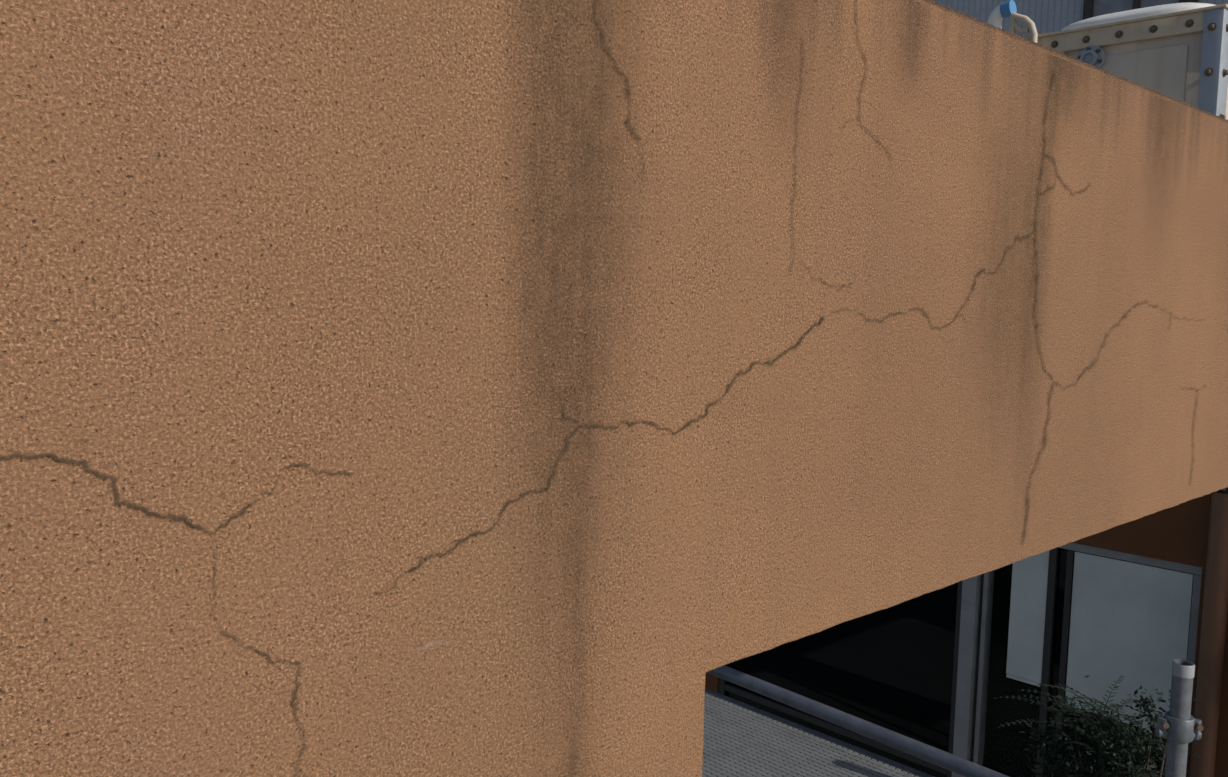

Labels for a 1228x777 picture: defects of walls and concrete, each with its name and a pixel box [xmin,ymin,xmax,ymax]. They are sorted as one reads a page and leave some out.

crack [562,317,825,450]
crack [1,453,251,531]
crack [290,463,349,475]
crack [410,478,552,572]
crack [228,634,276,663]
crack [292,683,300,714]